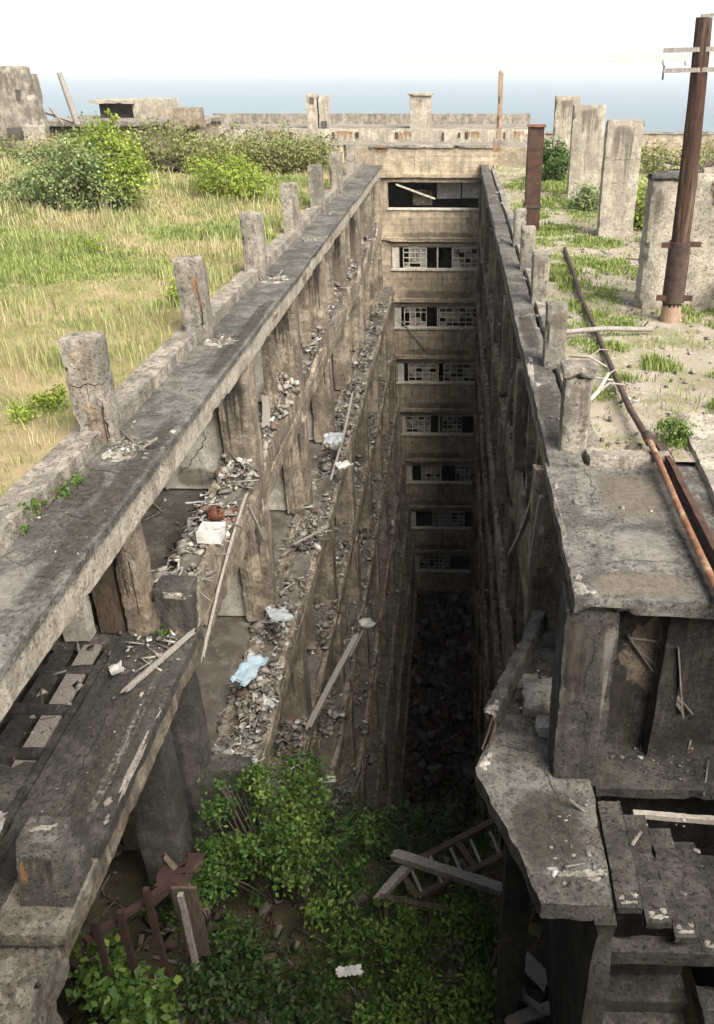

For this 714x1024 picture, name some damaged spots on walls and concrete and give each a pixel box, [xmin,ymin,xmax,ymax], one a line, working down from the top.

crack [67,383,110,438]
flaking render [619,617,664,693]
flaking render [676,646,693,719]
crack [500,744,559,797]
rust [20,864,28,883]